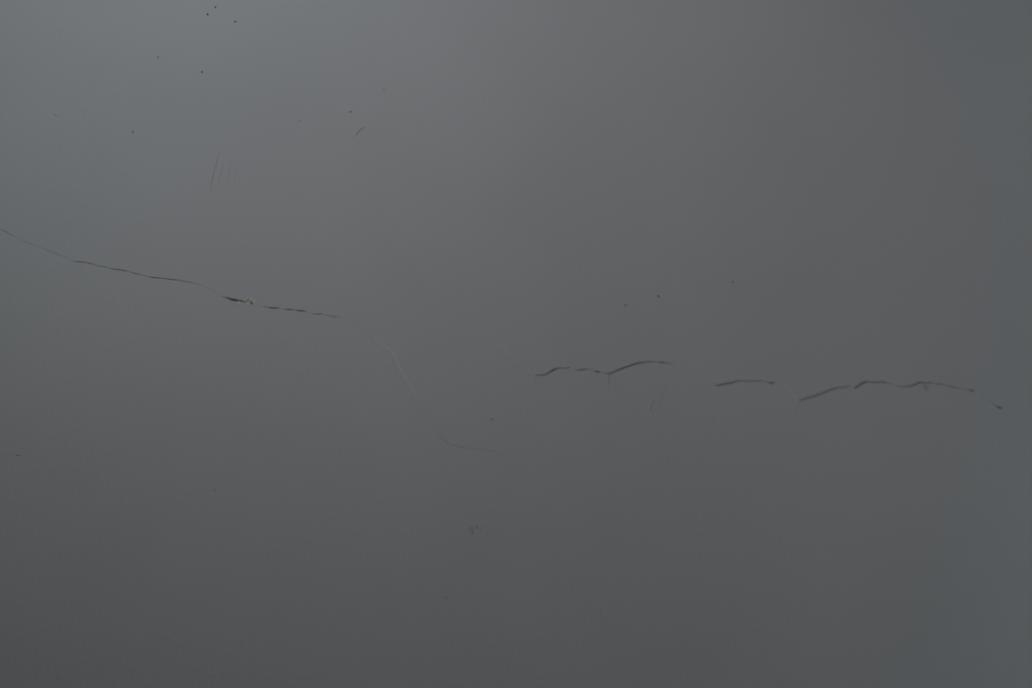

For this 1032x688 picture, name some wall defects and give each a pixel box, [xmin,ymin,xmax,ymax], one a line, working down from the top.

crack [482,305,1021,426]